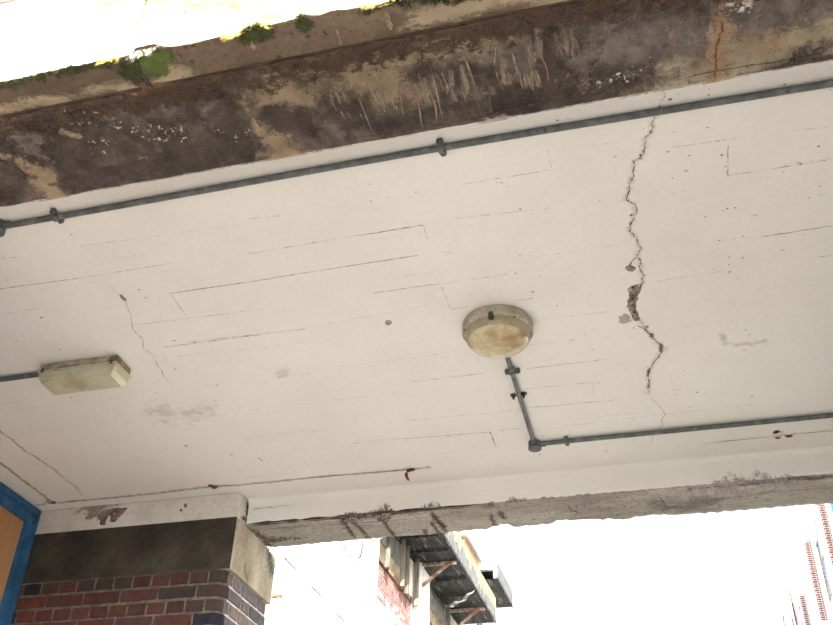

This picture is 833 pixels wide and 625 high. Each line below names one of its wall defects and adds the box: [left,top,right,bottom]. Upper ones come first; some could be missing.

corrosion [0,0,719,149]
leakage [0,0,833,206]
crack [625,5,826,287]
crack [111,286,170,384]
spalling [619,284,643,323]
crack [638,322,666,443]
peeling [97,506,129,526]
leakage [687,472,832,500]